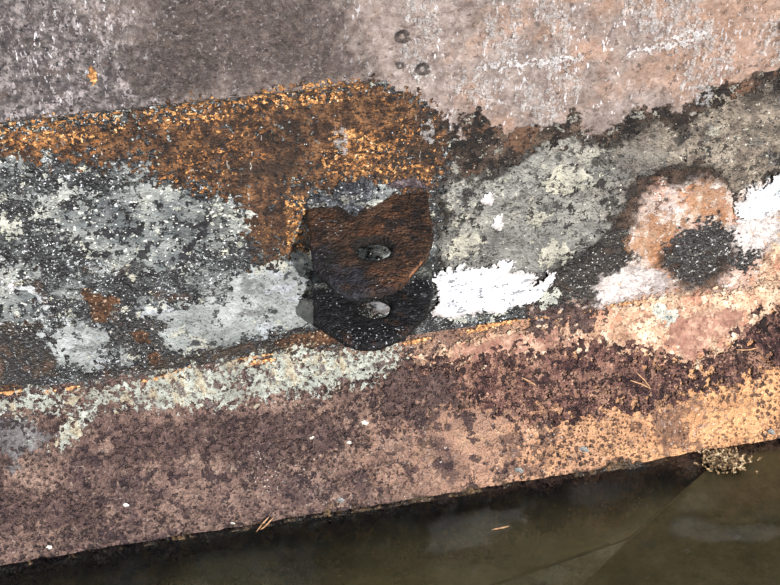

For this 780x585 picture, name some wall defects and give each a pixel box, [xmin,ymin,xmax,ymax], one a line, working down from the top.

corrosion [0,73,466,273]
water stain [446,68,780,180]
water stain [0,276,120,542]
water stain [107,315,170,358]
water stain [100,403,353,478]
water stain [370,159,780,433]